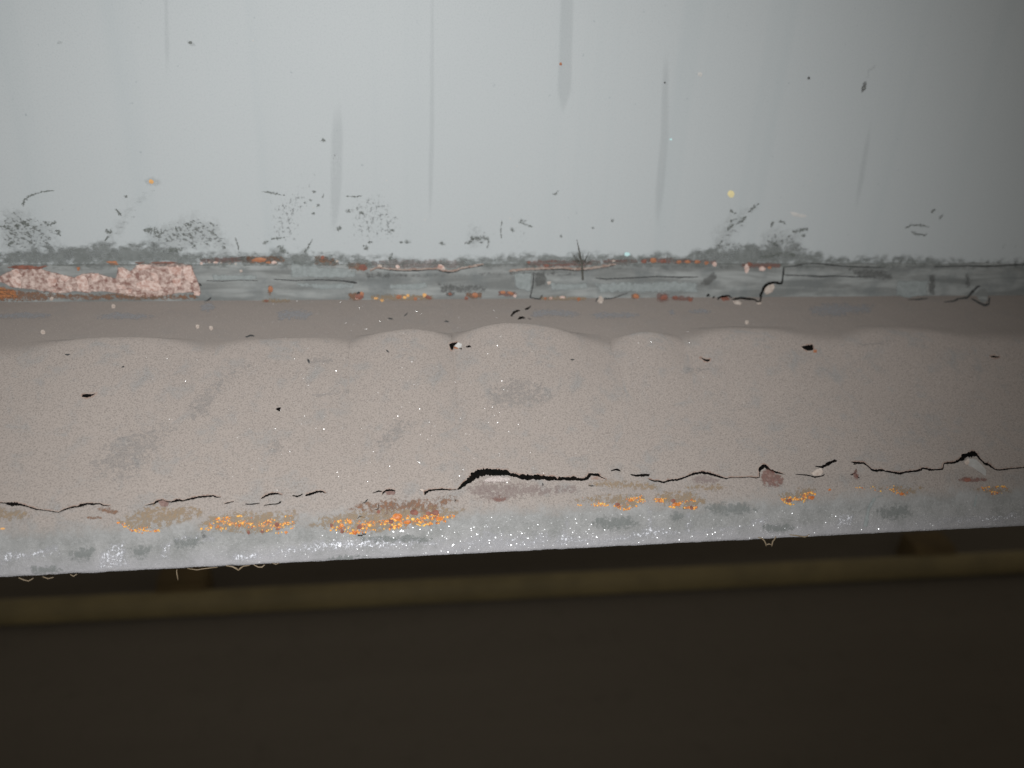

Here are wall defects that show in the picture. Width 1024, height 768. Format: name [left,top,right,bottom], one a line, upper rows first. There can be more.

water stain [0,190,61,249]
water stain [143,219,239,253]
corrosion [527,258,717,267]
peeling [0,261,200,308]
crack [595,263,884,305]
crack [0,501,111,513]
corrosion [87,507,295,537]
crack [144,489,326,507]
corrosion [311,498,460,535]
corrosion [577,480,723,511]
crack [357,450,1024,519]
water stain [288,538,406,552]